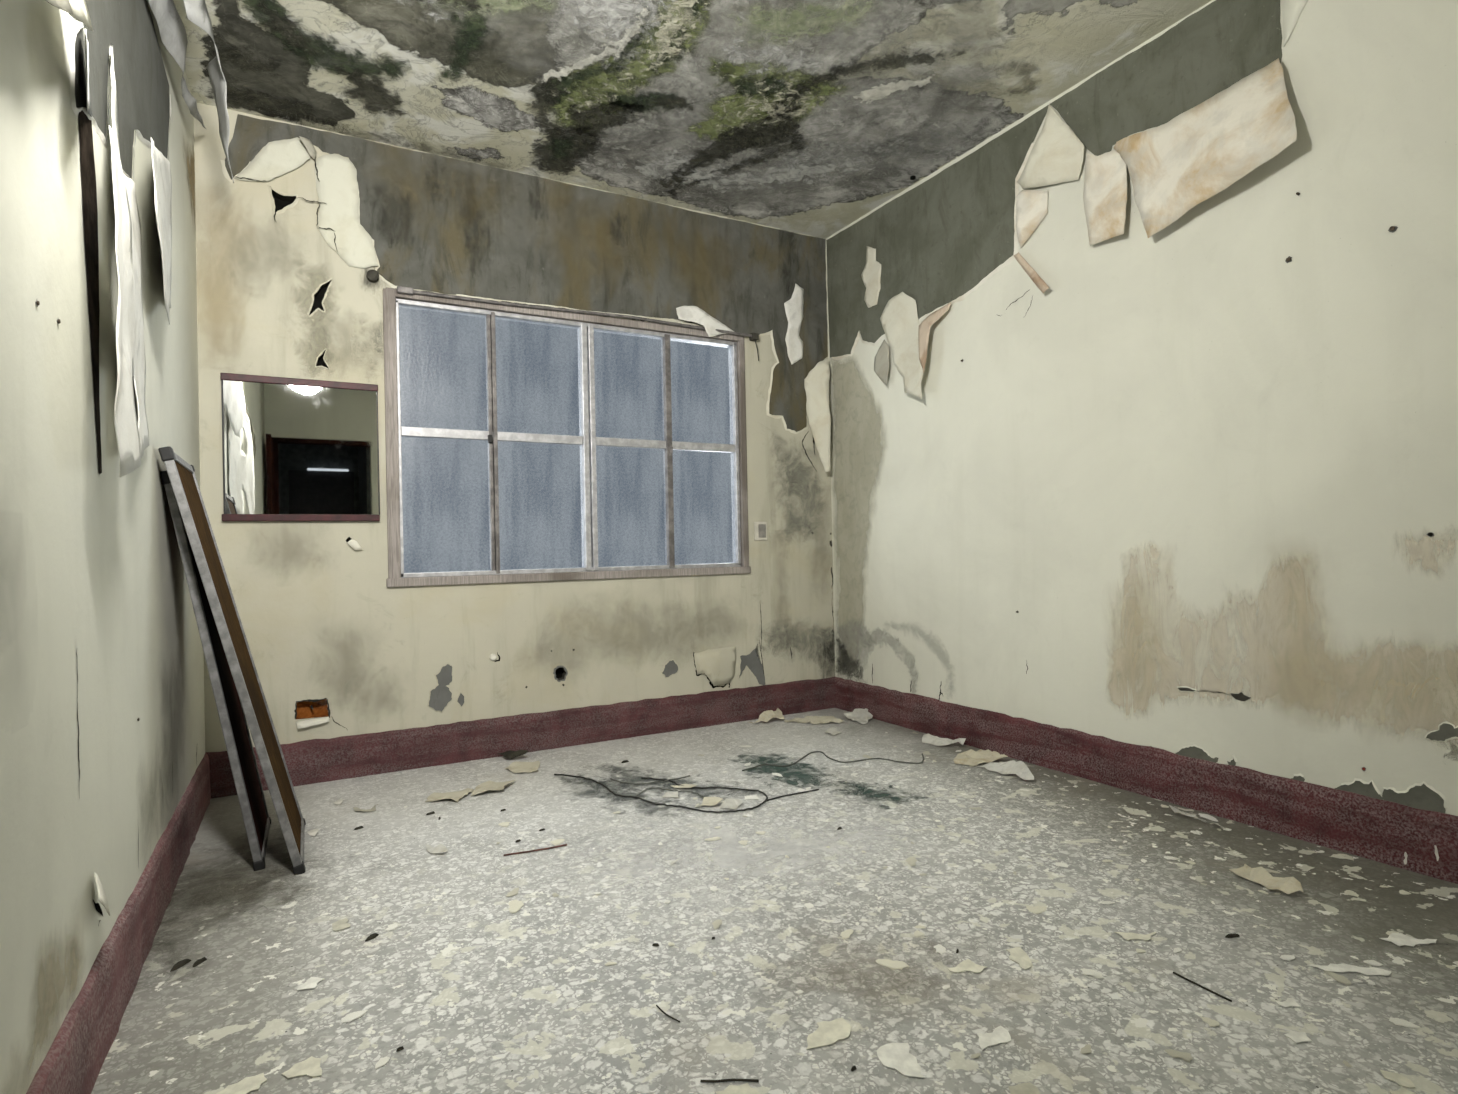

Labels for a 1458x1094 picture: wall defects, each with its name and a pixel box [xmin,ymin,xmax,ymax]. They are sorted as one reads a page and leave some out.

peeling [148,0,389,183]
leakage [206,0,407,118]
leakage [420,0,551,81]
peeling [319,0,1024,219]
leakage [521,0,976,206]
leakage [187,152,195,216]
leakage [769,362,882,679]
crack [74,651,82,799]
spalling [427,663,465,713]
spalling [738,605,765,685]
spalling [1334,767,1448,813]
spalling [1424,721,1458,756]